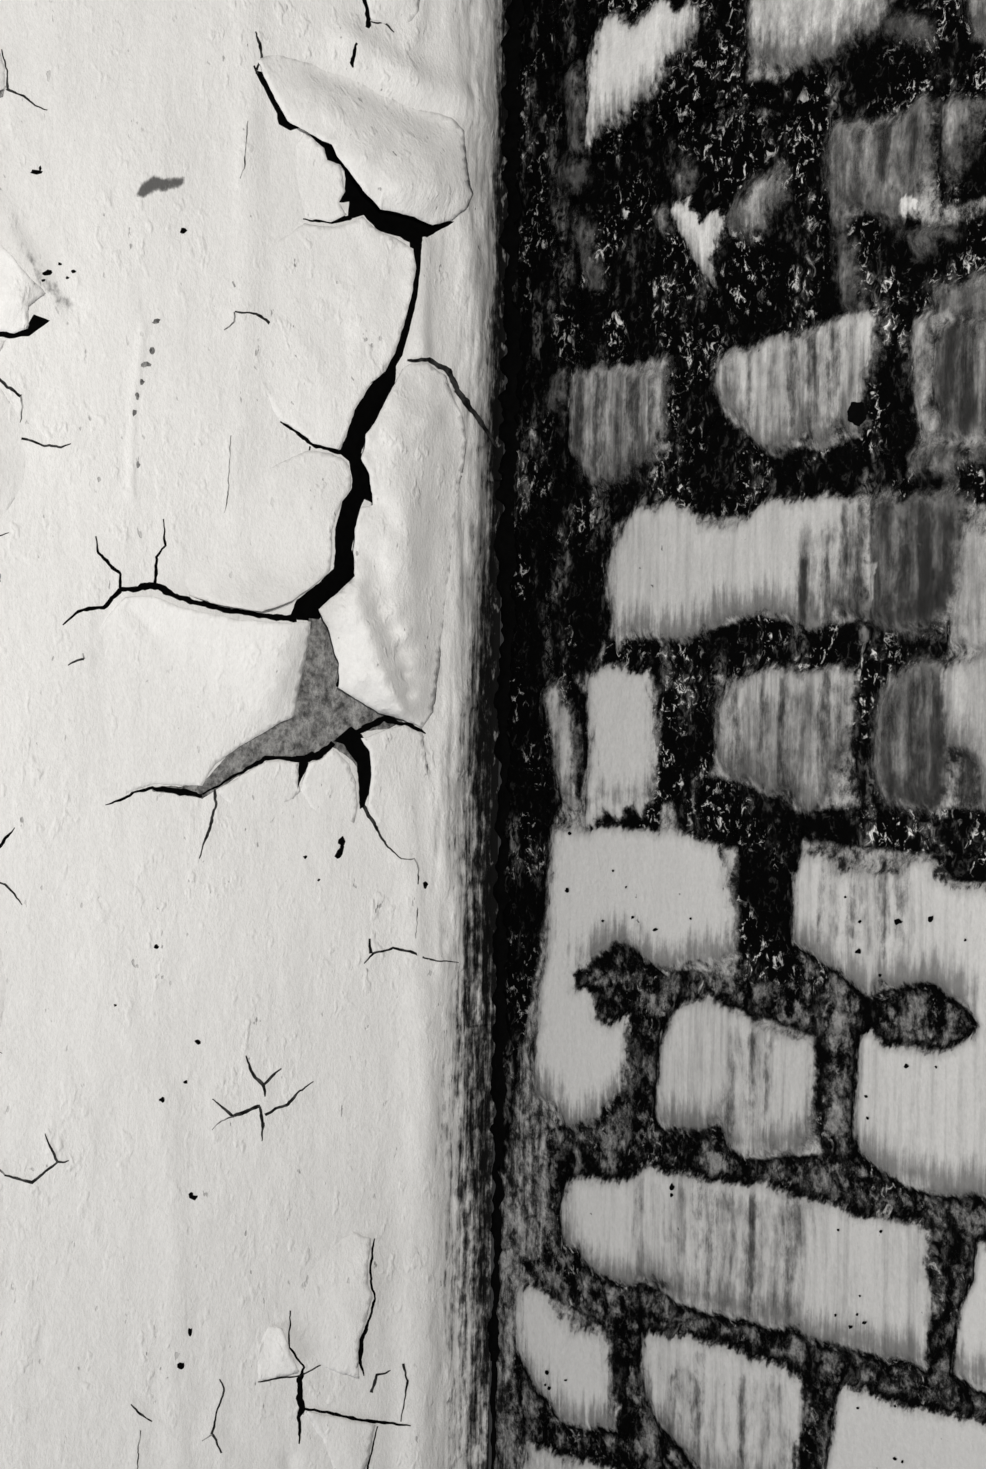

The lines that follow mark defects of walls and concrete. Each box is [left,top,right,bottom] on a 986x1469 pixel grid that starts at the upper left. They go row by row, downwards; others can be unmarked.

peeling [362,0,420,32]
peeling [0,49,47,110]
crack [240,121,248,178]
peeling [0,243,76,351]
crack [224,281,270,330]
crack [223,436,231,513]
peeling [62,32,498,859]
crack [199,789,218,859]
crack [212,1056,314,1141]